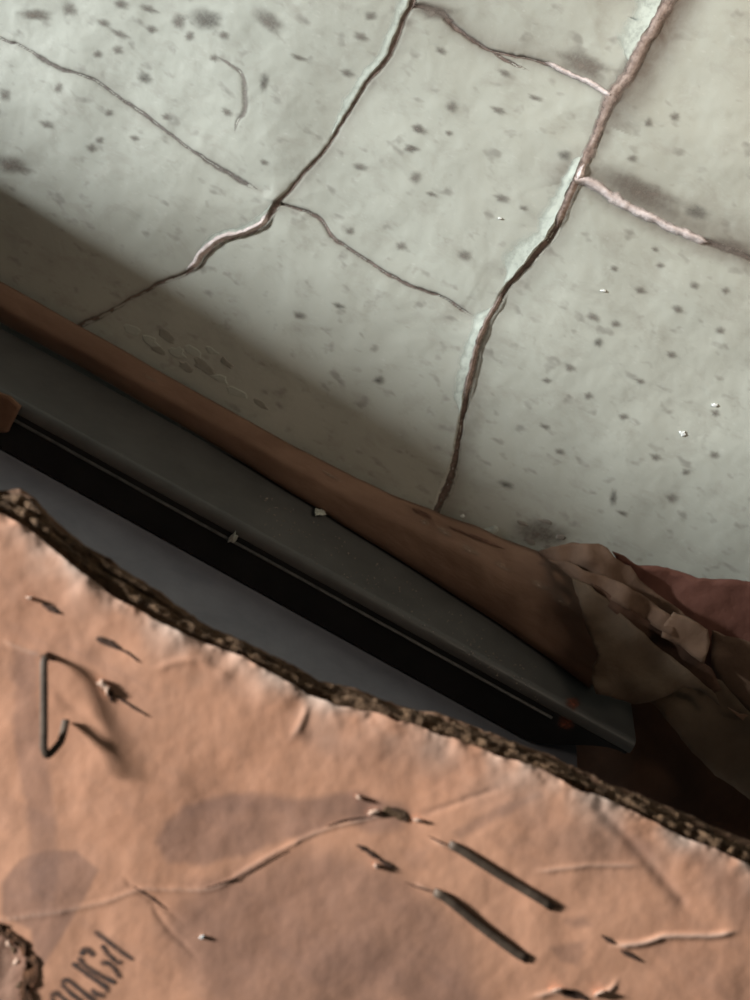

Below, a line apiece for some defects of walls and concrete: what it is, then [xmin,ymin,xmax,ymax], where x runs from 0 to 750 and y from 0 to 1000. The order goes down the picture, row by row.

crack [0,0,750,513]